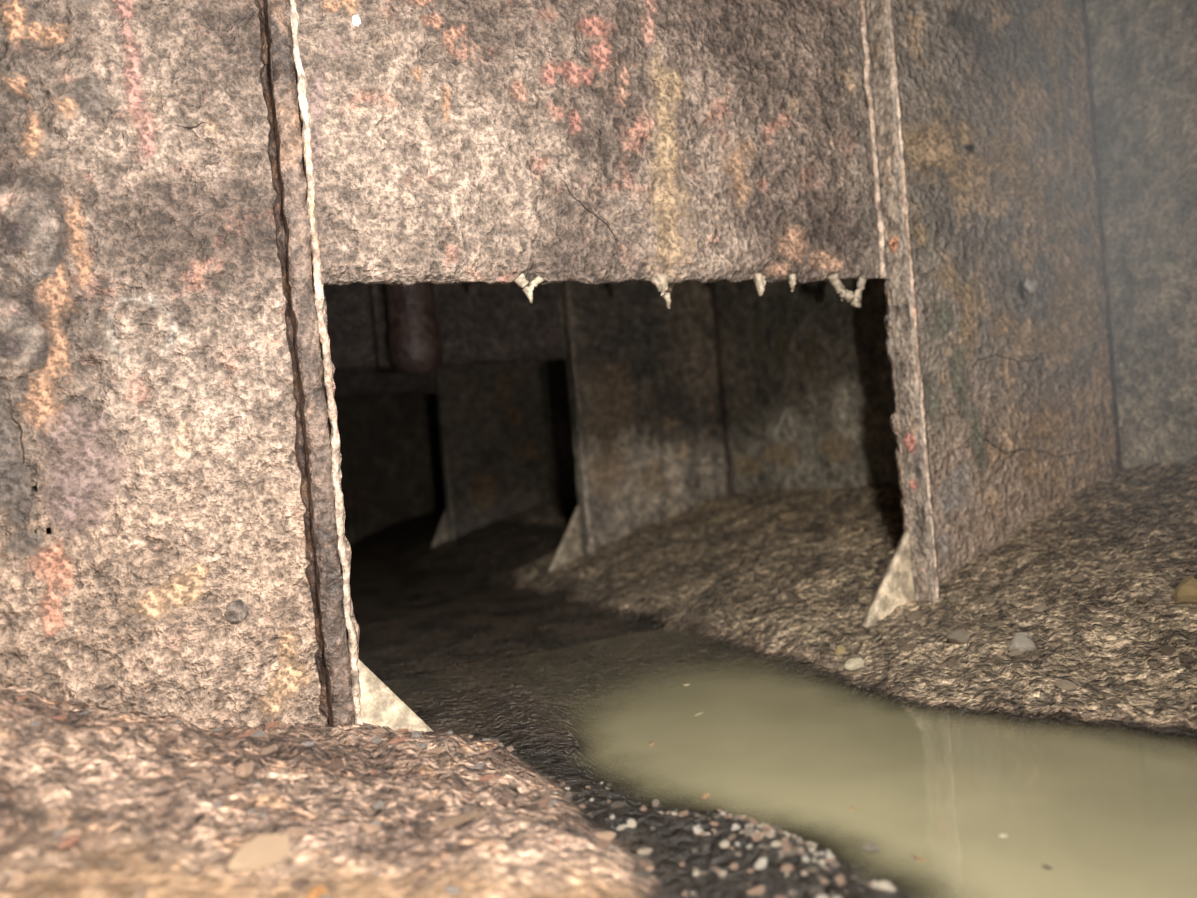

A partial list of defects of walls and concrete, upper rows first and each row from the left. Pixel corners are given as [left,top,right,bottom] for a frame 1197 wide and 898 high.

corrosion [4,0,64,45]
corrosion [543,17,628,103]
corrosion [9,78,25,91]
corrosion [512,81,526,100]
corrosion [59,99,75,110]
corrosion [570,112,581,133]
corrosion [23,115,41,154]